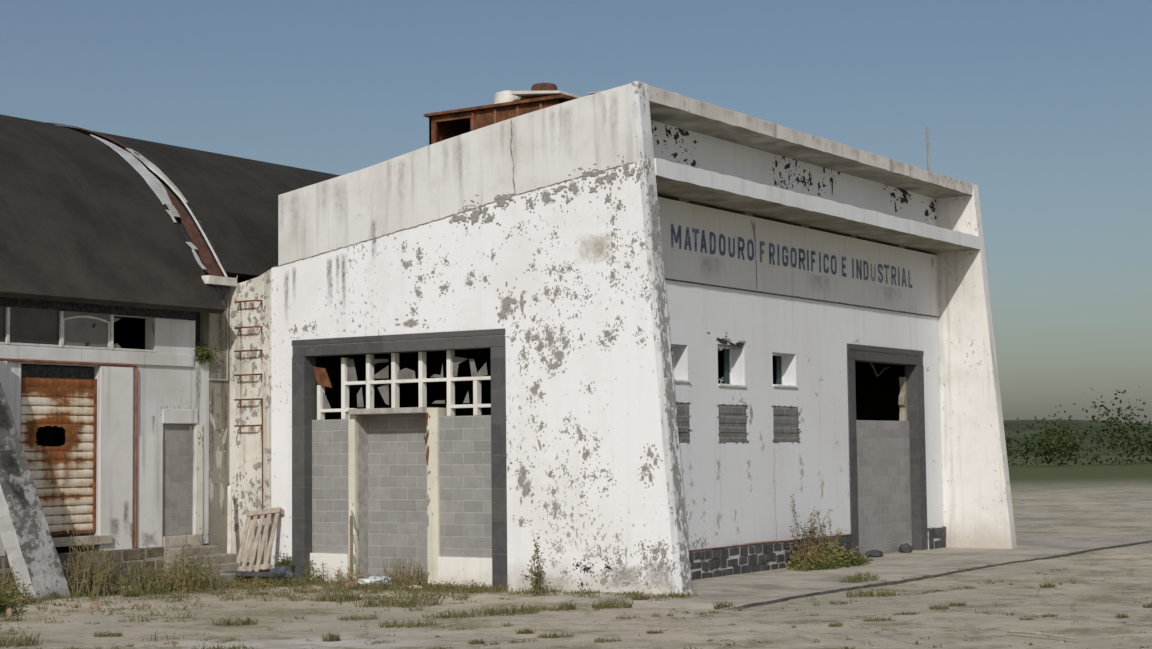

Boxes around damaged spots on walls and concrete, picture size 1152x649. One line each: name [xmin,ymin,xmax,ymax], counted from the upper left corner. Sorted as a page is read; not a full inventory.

rust [46,122,141,156]
rust [162,184,223,277]
peeling [772,154,840,196]
peeling [883,185,937,220]
peeling [289,320,318,339]
peeling [394,121,741,594]
peeling [160,275,271,532]
damp [0,446,28,507]